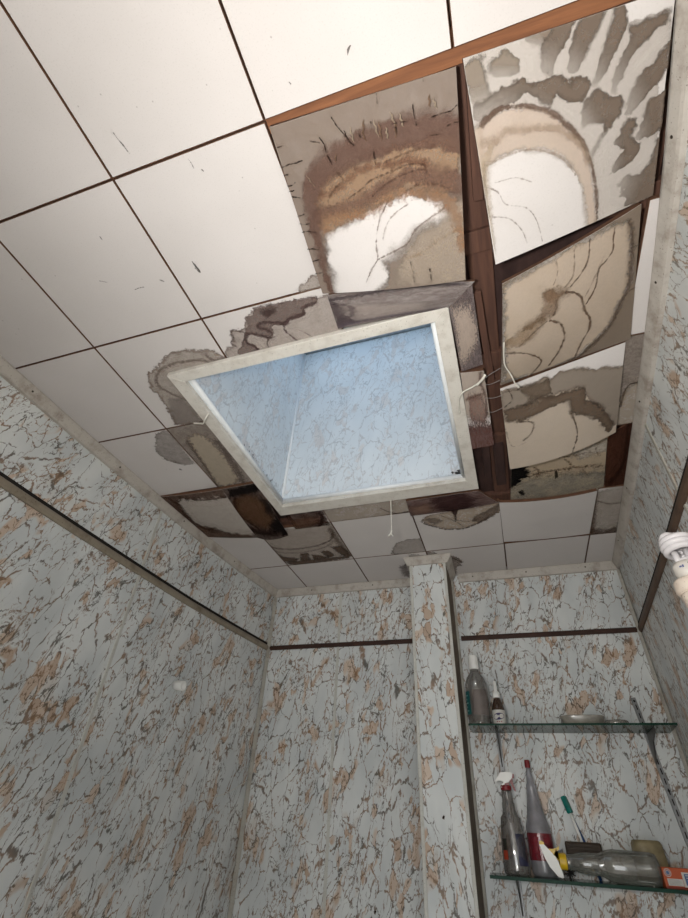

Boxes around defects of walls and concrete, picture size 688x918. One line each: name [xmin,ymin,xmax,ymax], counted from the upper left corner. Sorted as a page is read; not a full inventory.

damp [529,5,669,72]
damp [146,40,671,565]